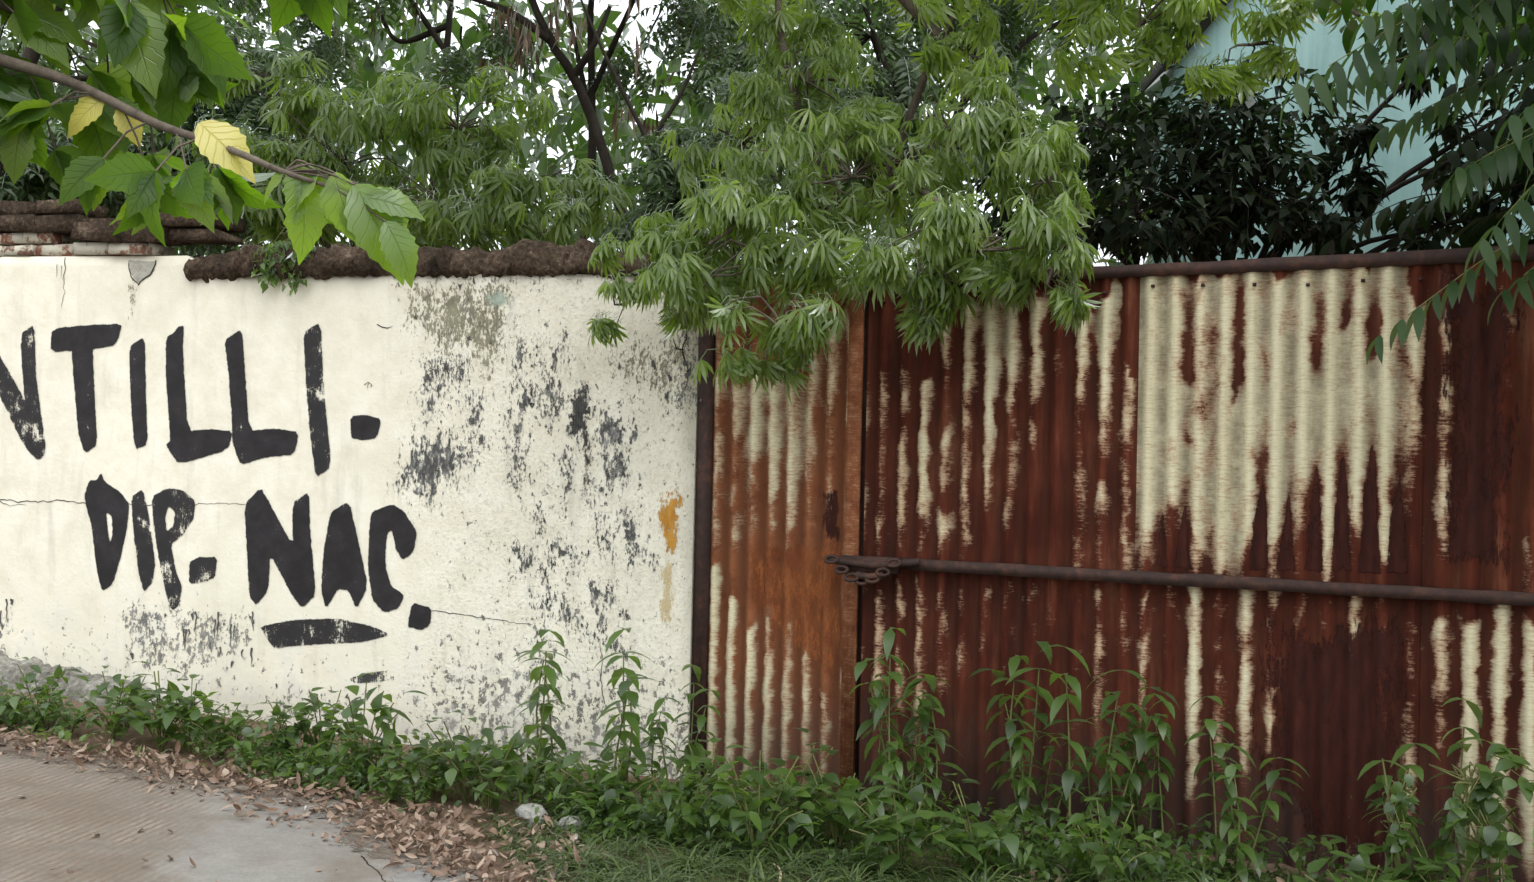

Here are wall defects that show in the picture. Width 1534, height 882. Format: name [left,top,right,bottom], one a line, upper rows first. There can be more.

leakage [392,276,521,380]
leakage [605,329,707,430]
rust [1426,263,1534,574]
rust [658,488,684,622]
rust [816,490,840,545]
rust [1154,506,1192,570]
rust [1250,445,1407,574]
leakage [519,560,562,697]
rust [1246,612,1413,876]